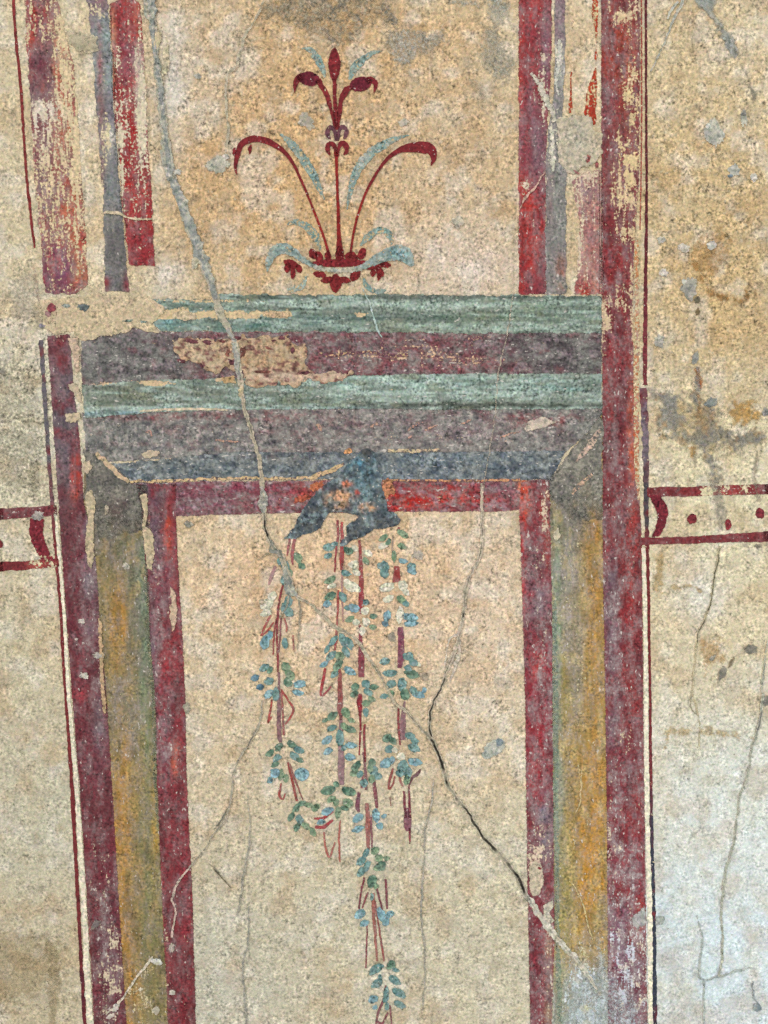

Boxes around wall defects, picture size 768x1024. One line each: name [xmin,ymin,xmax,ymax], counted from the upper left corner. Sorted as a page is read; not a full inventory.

peeling [555,114,603,175]
peeling [172,334,354,388]
crack [143,0,598,1011]
crack [689,546,721,747]
crack [106,700,263,1024]
crack [696,640,768,1024]